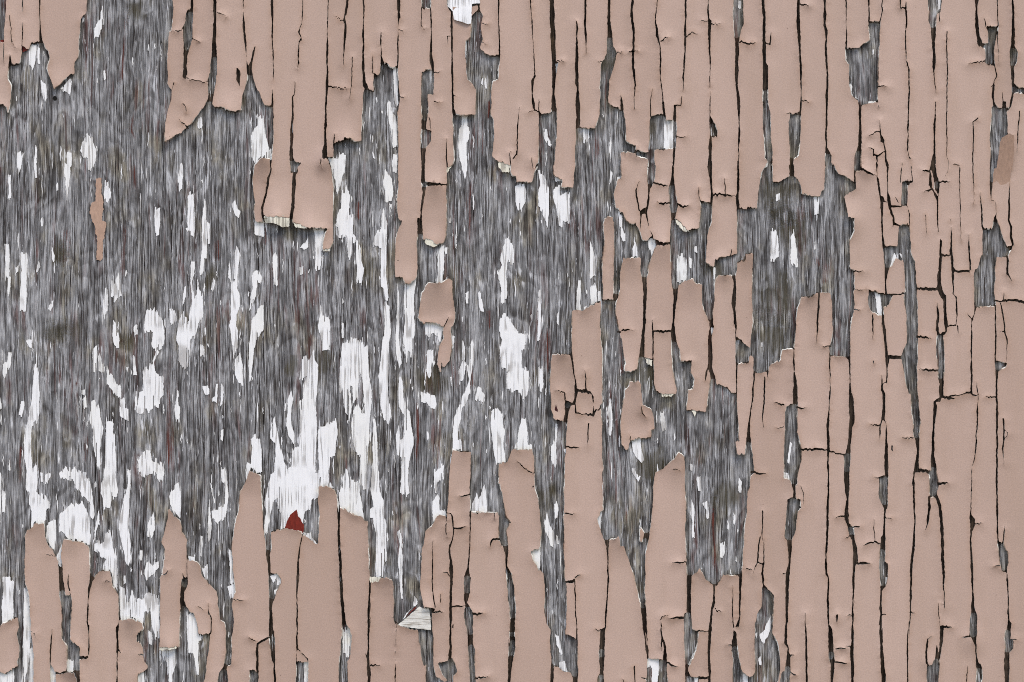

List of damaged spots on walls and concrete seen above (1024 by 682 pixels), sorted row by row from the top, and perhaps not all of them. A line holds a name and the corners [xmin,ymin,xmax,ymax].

crack [170,0,500,235]
crack [502,0,771,246]
peeling [669,90,861,373]
peeling [0,0,754,682]
crack [550,0,1024,682]
peeling [784,404,801,484]
crack [8,540,110,682]
crack [180,555,212,636]
crack [221,528,308,682]
crack [337,507,398,682]
crack [431,493,511,660]
crack [474,618,515,682]